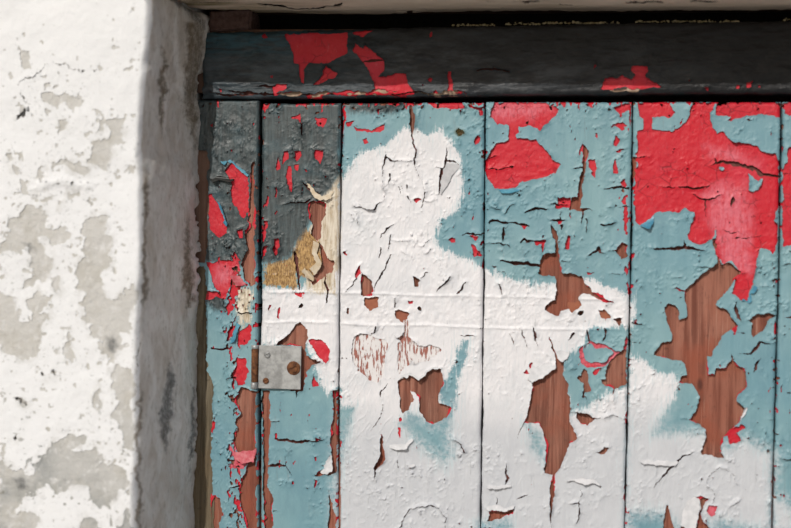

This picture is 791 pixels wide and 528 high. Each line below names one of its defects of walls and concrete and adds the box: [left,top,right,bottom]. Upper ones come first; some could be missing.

peeling [263,31,597,218]
crack [382,135,460,208]
crack [664,185,735,217]
crack [713,159,781,177]
peeling [0,98,140,528]
crack [324,224,394,303]
crack [422,272,466,294]
peeling [534,225,622,326]
crack [653,242,708,268]
peeling [609,102,791,458]
peeling [398,367,452,433]
peeling [524,336,630,528]